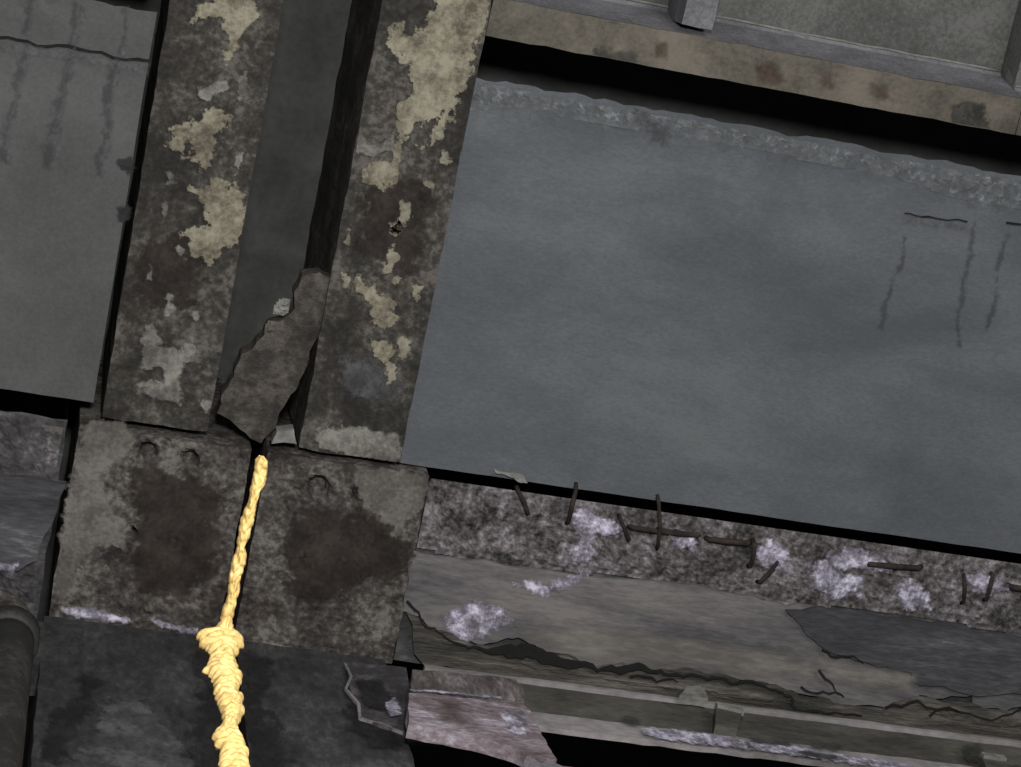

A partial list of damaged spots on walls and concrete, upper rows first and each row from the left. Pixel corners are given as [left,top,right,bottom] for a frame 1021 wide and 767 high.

peeling [190,0,260,67]
peeling [159,71,249,267]
peeling [164,294,177,317]
peeling [136,324,199,415]
leakage [54,420,225,602]
leakage [279,425,429,609]
crack [406,600,864,717]
spalling [406,468,1021,767]
crack [885,700,1021,721]